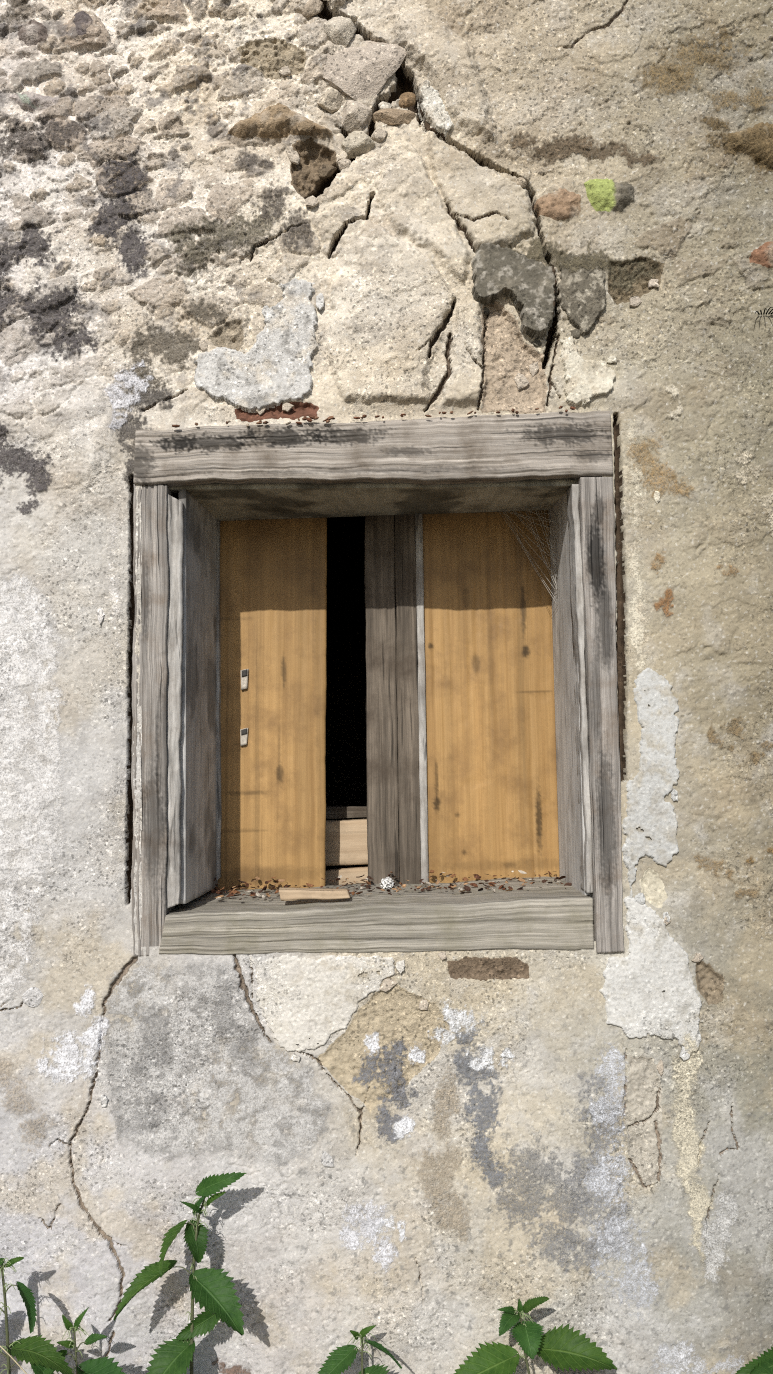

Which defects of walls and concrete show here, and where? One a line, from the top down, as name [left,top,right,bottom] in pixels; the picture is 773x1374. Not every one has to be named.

crack [317,0,371,41]
crack [563,0,629,49]
flaking render [194,278,324,422]
crack [313,65,560,413]
spalling [471,243,665,414]
flaking render [599,418,725,1061]
crack [41,957,138,1357]
flaking render [100,954,450,1167]
crack [233,954,363,1149]
water stain [353,1002,659,1316]
crack [623,1055,662,1188]
spalling [625,1056,664,1186]